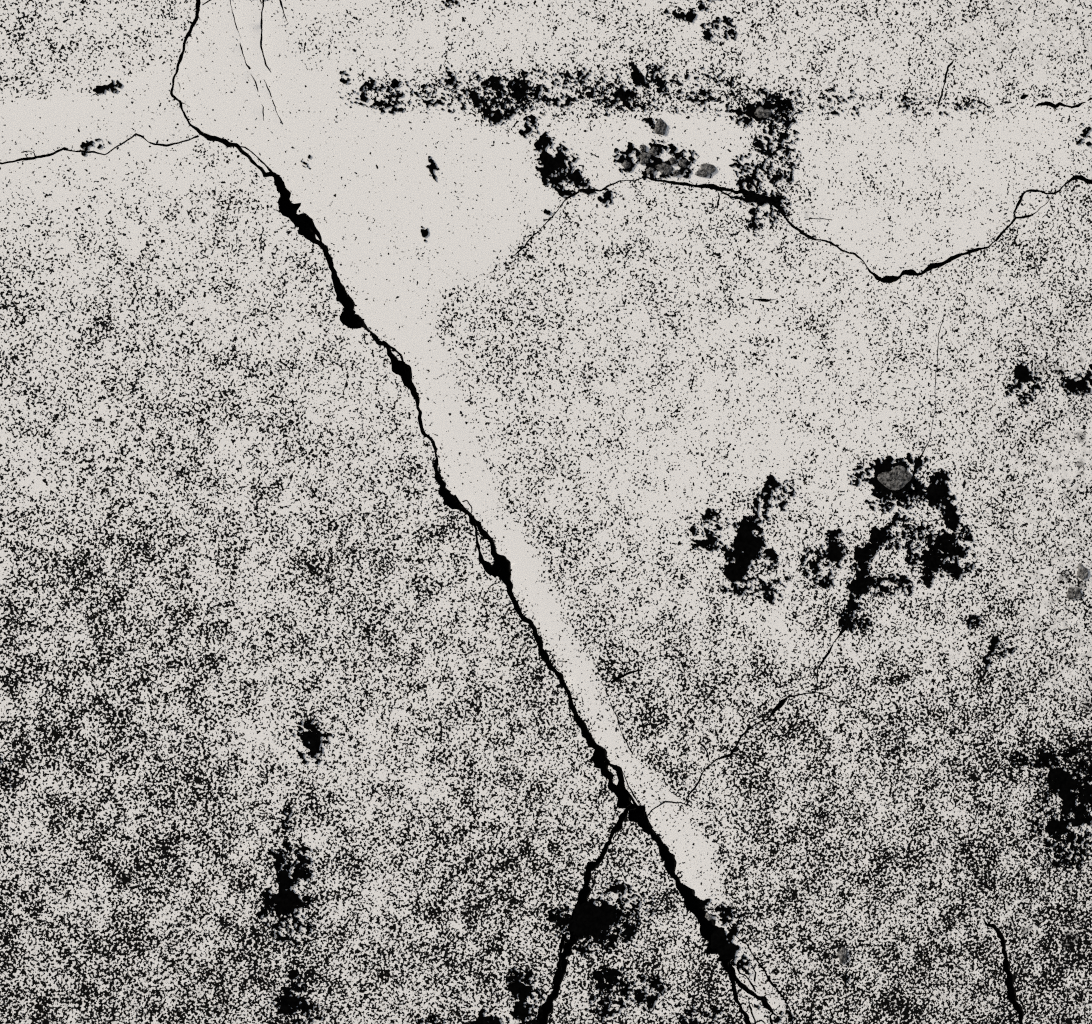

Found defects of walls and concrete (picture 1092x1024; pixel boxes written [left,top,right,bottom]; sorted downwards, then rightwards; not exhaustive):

crack [937,59,954,109]
crack [513,175,1092,283]
crack [913,319,944,475]
crack [0,0,848,1024]
crack [983,919,1024,1024]